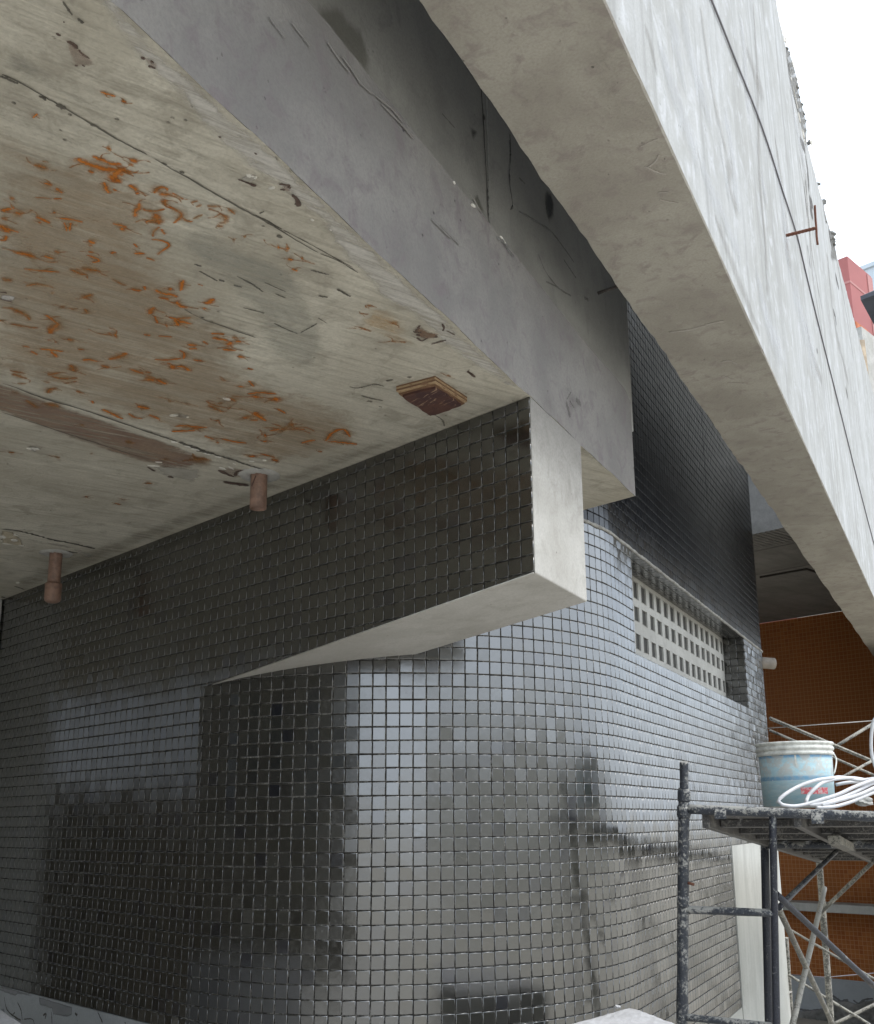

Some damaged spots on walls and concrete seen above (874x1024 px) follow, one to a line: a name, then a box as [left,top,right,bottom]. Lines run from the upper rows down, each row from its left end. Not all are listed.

rust [0,157,215,337]
rust [69,146,235,260]
crack [0,74,358,337]
crack [481,89,589,301]
rust [786,205,819,250]
rust [0,294,356,462]